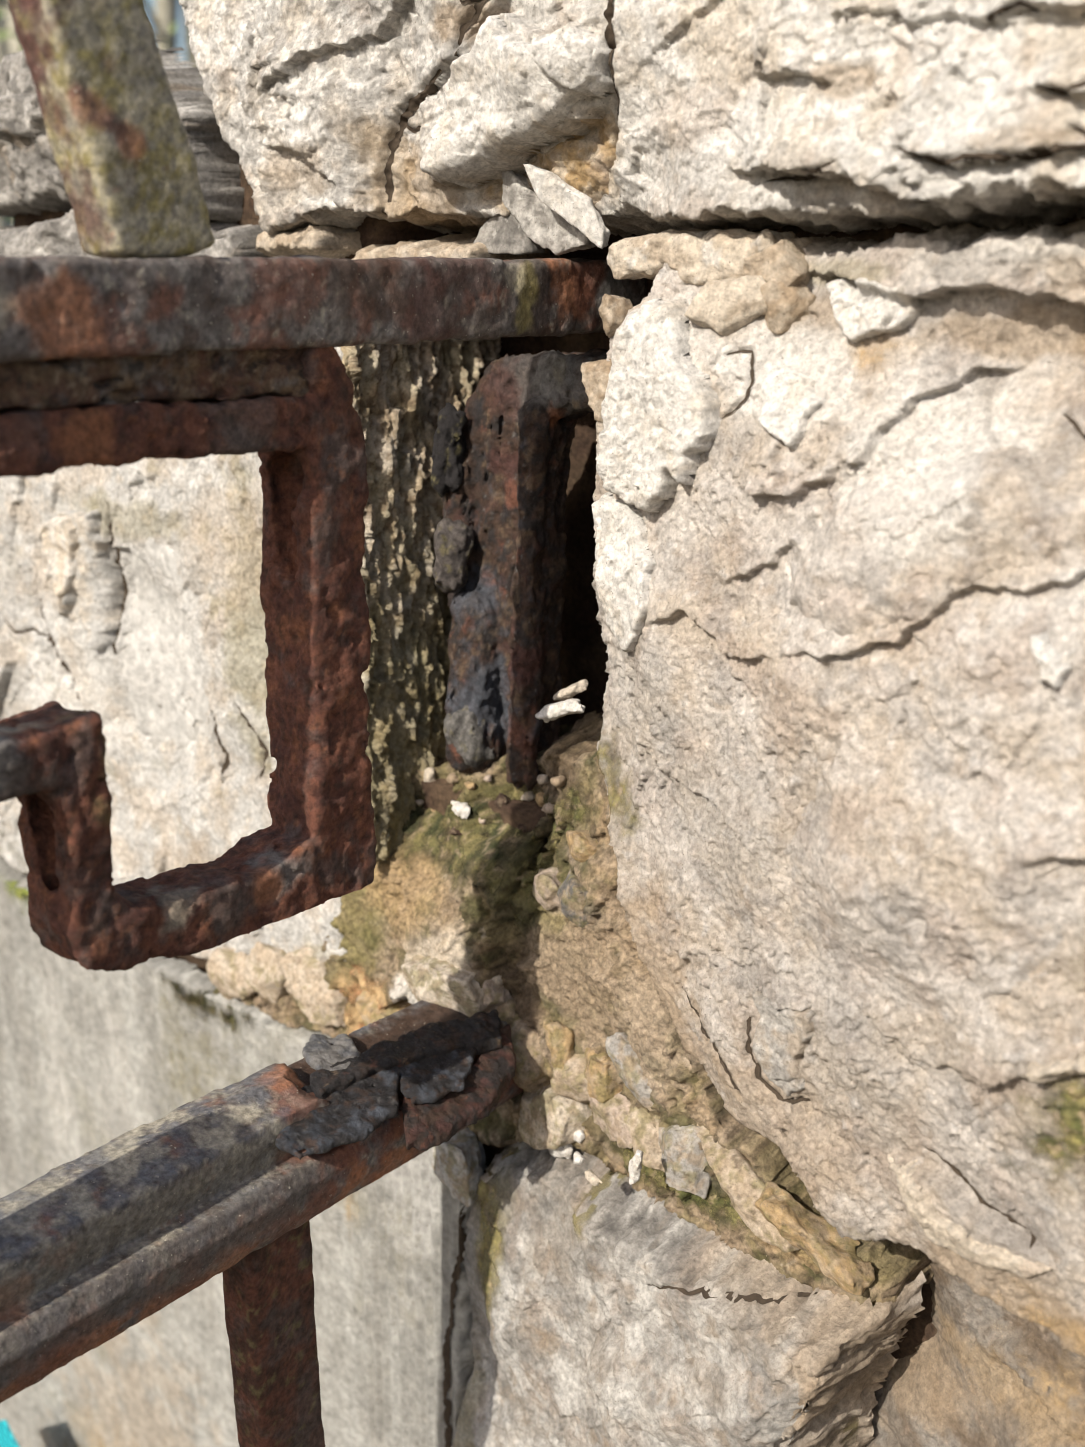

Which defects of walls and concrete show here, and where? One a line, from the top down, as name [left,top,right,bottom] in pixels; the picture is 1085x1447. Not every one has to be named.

crack [603,0,620,111]
crack [381,0,488,215]
rust [0,348,309,412]
rust [334,966,388,1034]
crack [647,1284,818,1305]